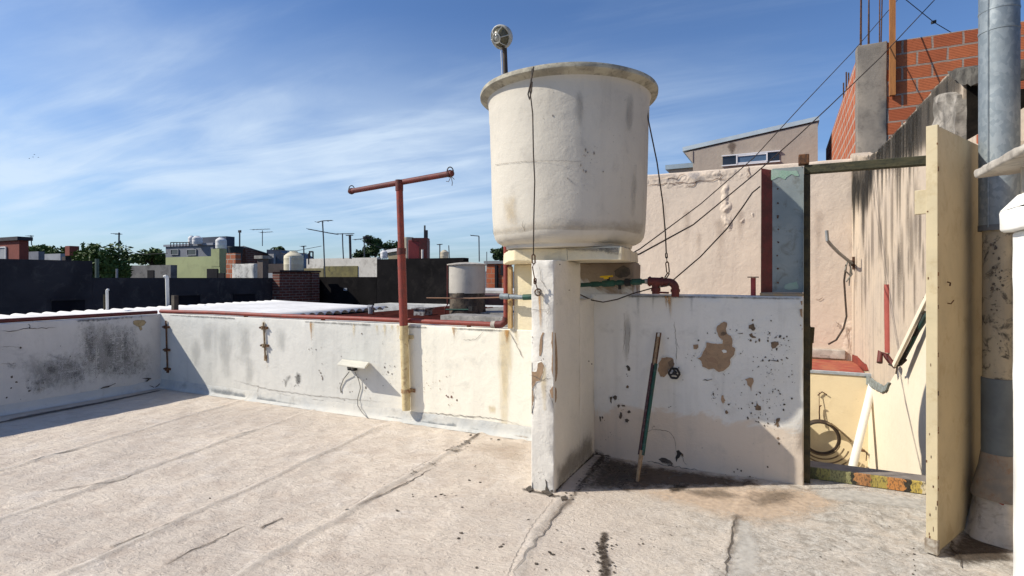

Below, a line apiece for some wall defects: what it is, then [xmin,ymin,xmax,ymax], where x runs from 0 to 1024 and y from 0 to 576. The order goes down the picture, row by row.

damp [852,75,960,228]
peeling [532,332,558,410]
peeling [657,319,793,445]
crack [513,501,568,575]
damp [599,532,610,576]
crack [724,519,736,574]